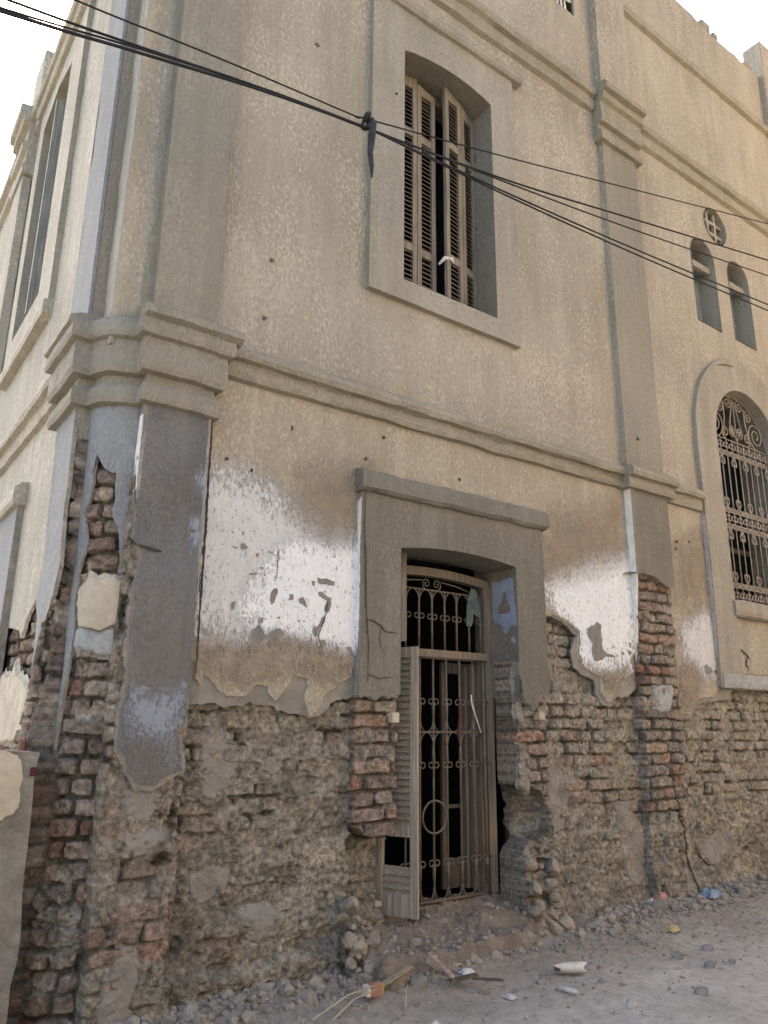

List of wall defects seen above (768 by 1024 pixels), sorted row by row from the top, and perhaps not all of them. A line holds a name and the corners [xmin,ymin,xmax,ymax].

spalling [0,414,399,1024]
crack [196,422,213,674]
crack [364,491,395,683]
spalling [492,574,768,938]